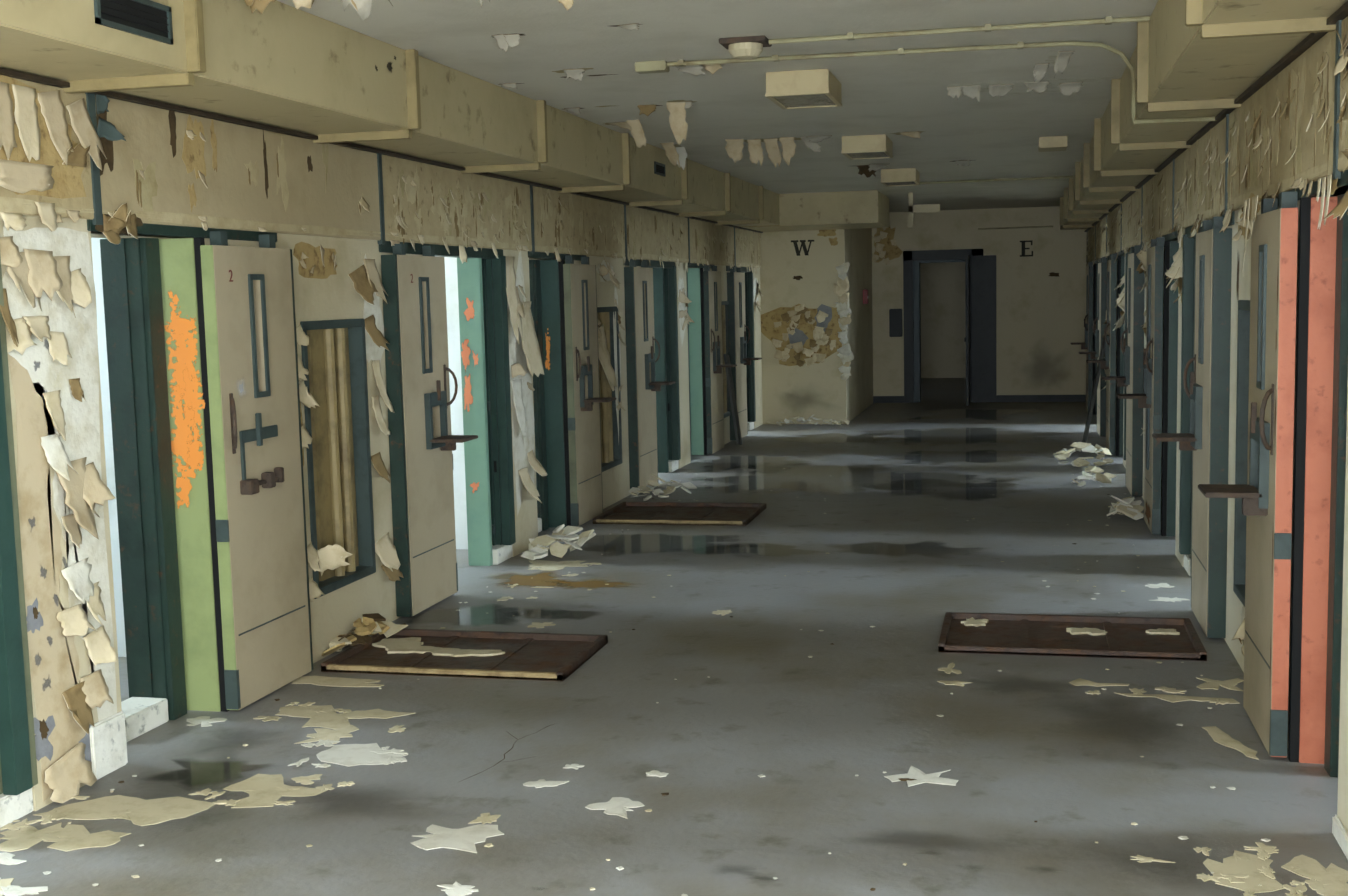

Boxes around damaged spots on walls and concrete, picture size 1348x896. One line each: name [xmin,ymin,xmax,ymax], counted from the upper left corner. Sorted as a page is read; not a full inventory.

peeling [292,0,314,10]
peeling [342,0,393,20]
peeling [491,34,524,52]
peeling [552,68,617,81]
peeling [1086,30,1348,337]
peeling [872,225,903,265]
peeling [0,75,854,803]
peeling [45,824,131,851]
peeling [1203,850,1348,896]